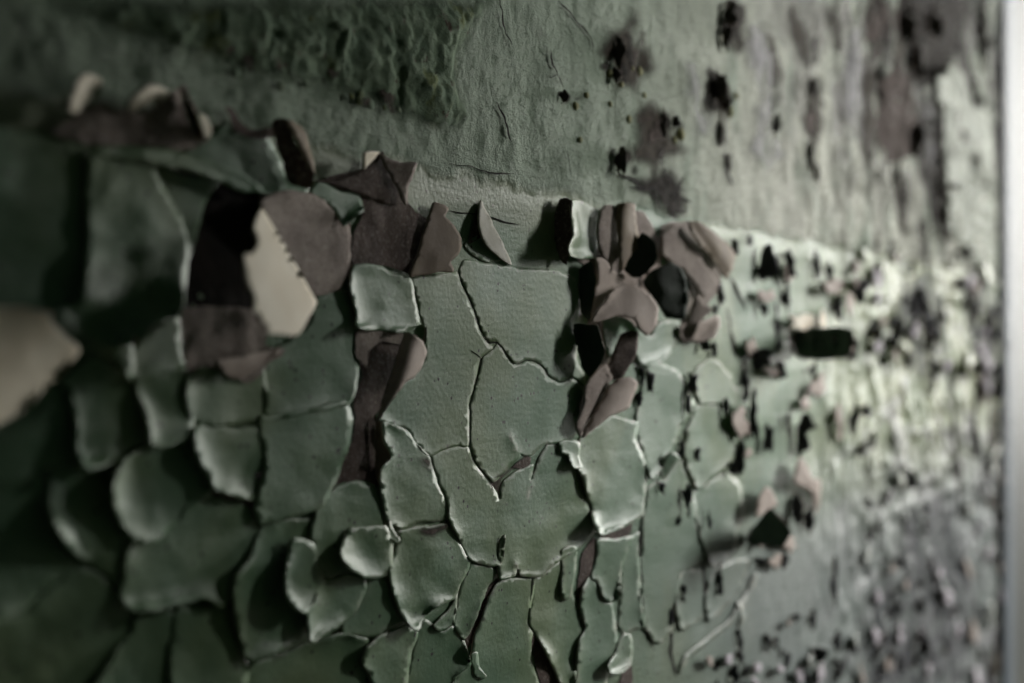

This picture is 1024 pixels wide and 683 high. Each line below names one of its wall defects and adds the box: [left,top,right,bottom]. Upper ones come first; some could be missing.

spalling [602,19,685,175]
peeling [0,67,899,683]
crack [459,272,576,472]
crack [721,276,746,357]
crack [639,520,677,677]
crack [700,562,708,600]
peeling [864,422,1006,683]